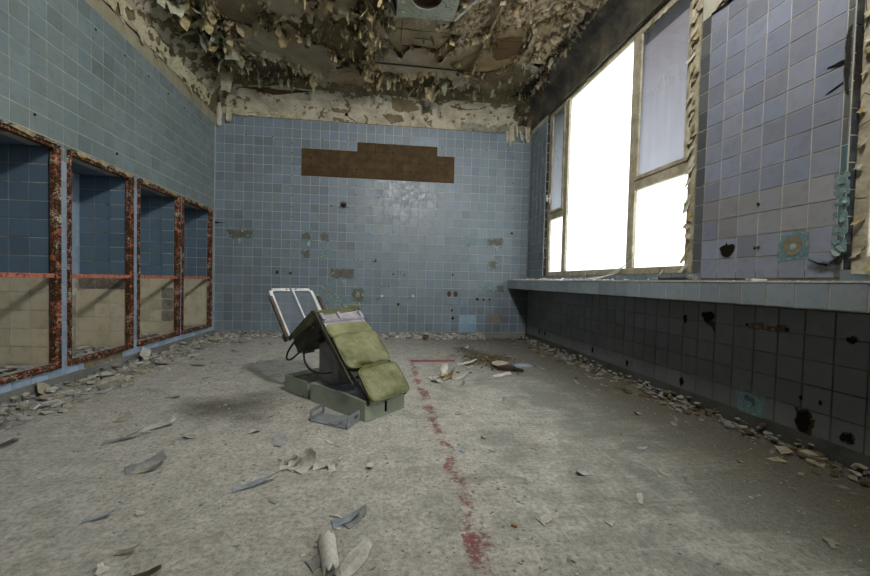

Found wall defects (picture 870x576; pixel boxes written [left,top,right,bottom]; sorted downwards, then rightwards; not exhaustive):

peeling [125,0,608,147]
peeling [556,7,667,111]
peeling [675,0,735,273]
peeling [301,142,455,184]
peeling [830,164,870,275]
peeling [485,232,513,271]
peeling [328,267,366,306]
spalling [794,395,815,436]
spalling [839,432,855,445]